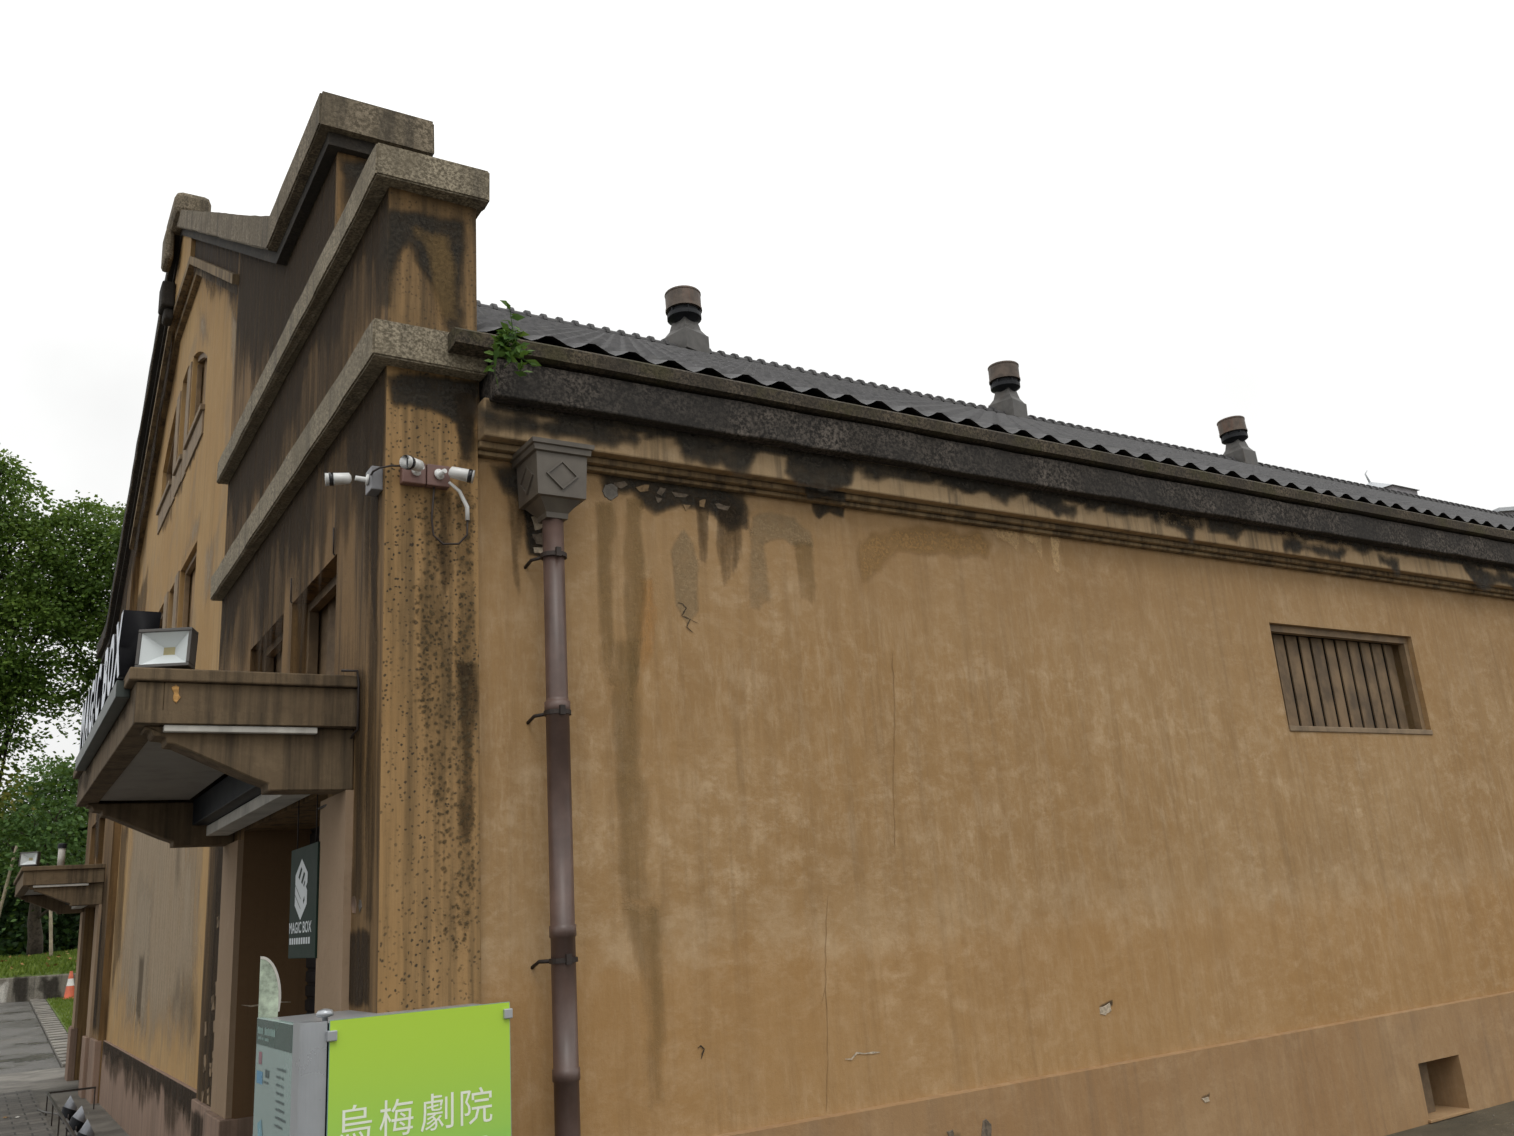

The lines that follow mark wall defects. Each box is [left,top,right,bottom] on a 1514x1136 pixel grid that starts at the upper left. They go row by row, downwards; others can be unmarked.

damp [116,332,173,634]
damp [205,191,387,583]
damp [478,402,1514,590]
damp [414,494,476,951]
damp [93,826,223,1128]
peeling [981,1119,992,1136]